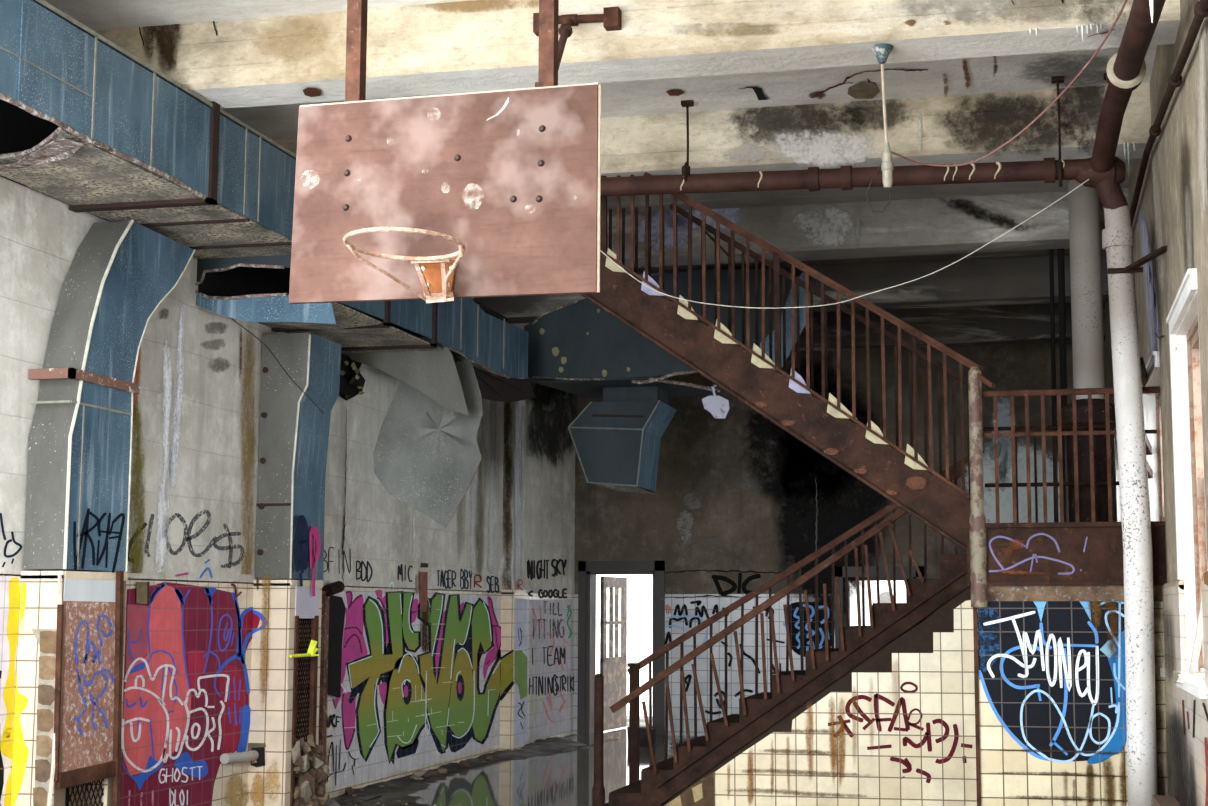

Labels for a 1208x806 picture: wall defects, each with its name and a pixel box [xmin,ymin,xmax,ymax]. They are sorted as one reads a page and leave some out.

leakage [143,24,180,71]
leakage [943,86,1104,181]
leakage [203,322,230,371]
leakage [129,309,183,573]
corrosion [240,332,270,698]
corrosion [1089,601,1117,655]
corrosion [251,774,264,806]
corrosion [1065,753,1127,806]